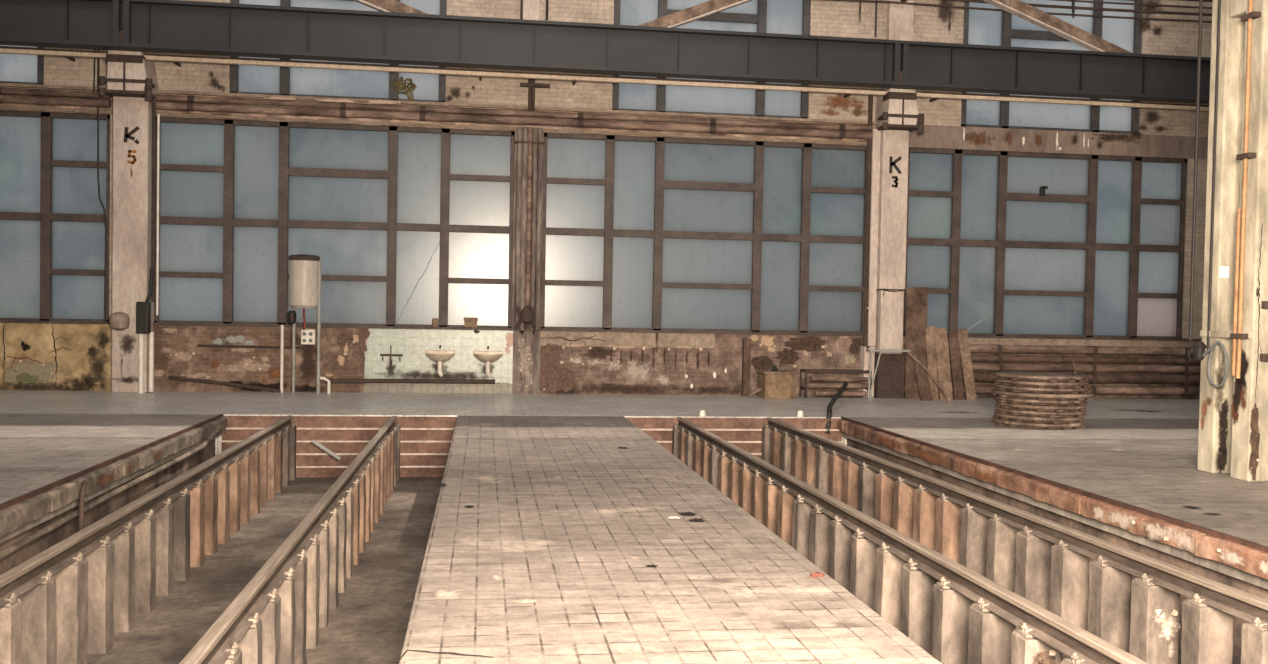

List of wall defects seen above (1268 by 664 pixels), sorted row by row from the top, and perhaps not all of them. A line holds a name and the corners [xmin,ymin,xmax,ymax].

leakage [0,332,138,391]
spalling [505,333,652,394]
spalling [750,304,870,370]
rust [1231,351,1249,424]